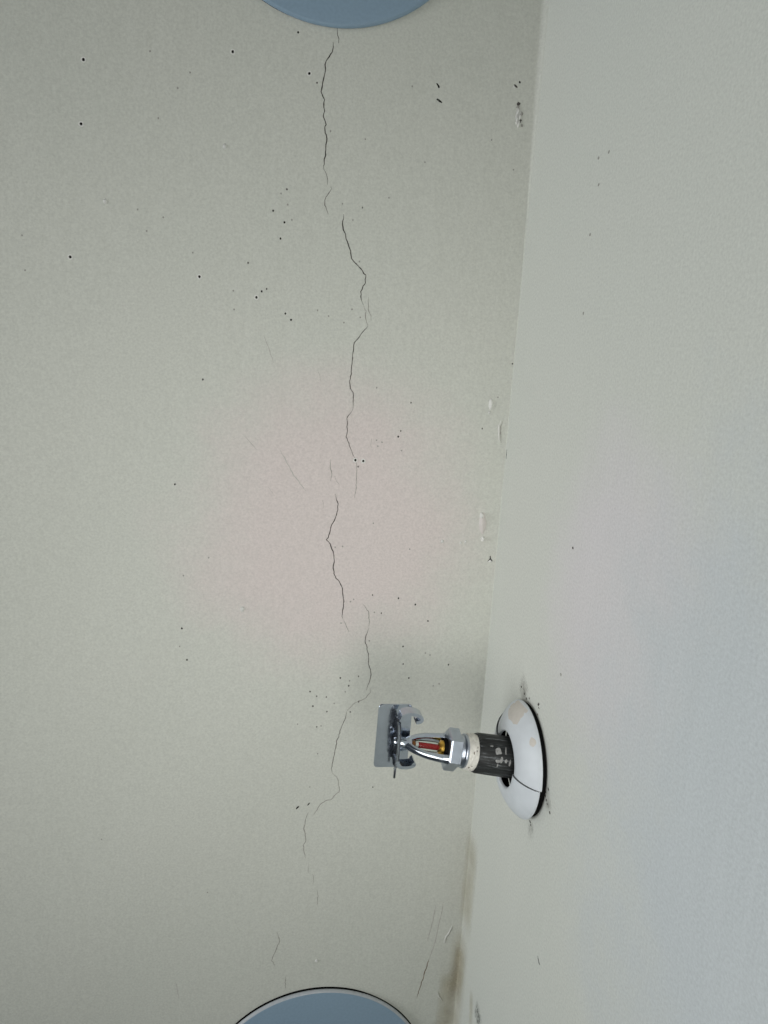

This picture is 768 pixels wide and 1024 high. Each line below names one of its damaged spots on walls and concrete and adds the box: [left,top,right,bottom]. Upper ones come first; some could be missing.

crack [303,30,372,904]